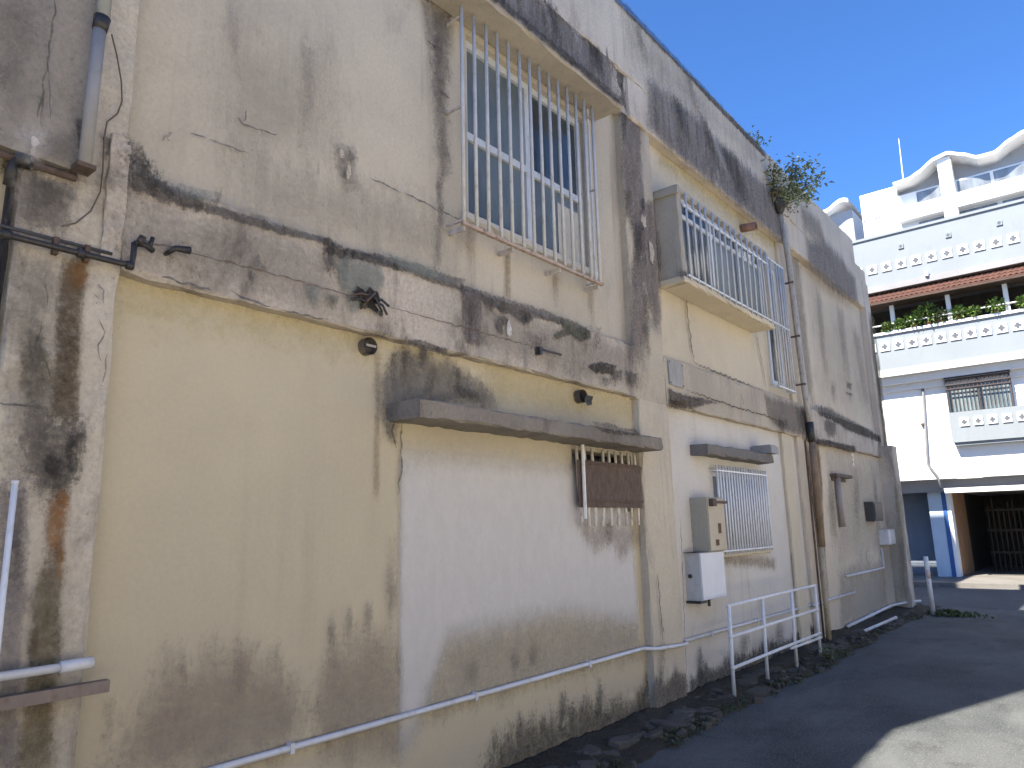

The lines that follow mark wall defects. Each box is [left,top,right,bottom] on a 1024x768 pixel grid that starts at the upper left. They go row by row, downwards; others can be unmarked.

crack [37,0,57,121]
crack [162,111,277,153]
water stain [126,142,564,344]
crack [373,179,458,219]
water stain [494,0,782,386]
water stain [17,259,88,509]
water stain [382,338,496,438]
rust [47,491,69,574]
water stain [26,552,63,691]
water stain [18,702,53,768]
water stain [484,625,826,768]